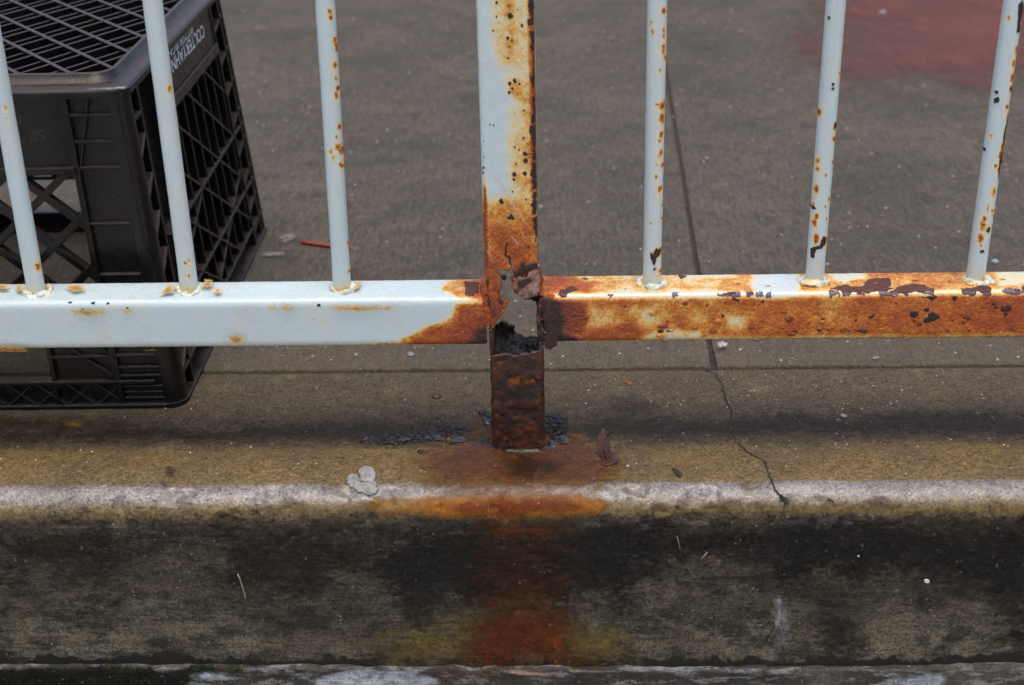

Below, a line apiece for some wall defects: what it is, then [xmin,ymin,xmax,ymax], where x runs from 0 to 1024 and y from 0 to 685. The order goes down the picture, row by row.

peeling [513,264,541,296]
corrosion [647,310,669,338]
peeling [830,278,971,331]
peeling [953,285,1012,317]
damp [0,507,180,632]
corrosion [366,428,640,685]
crack [0,369,1024,667]
damp [209,507,1024,658]